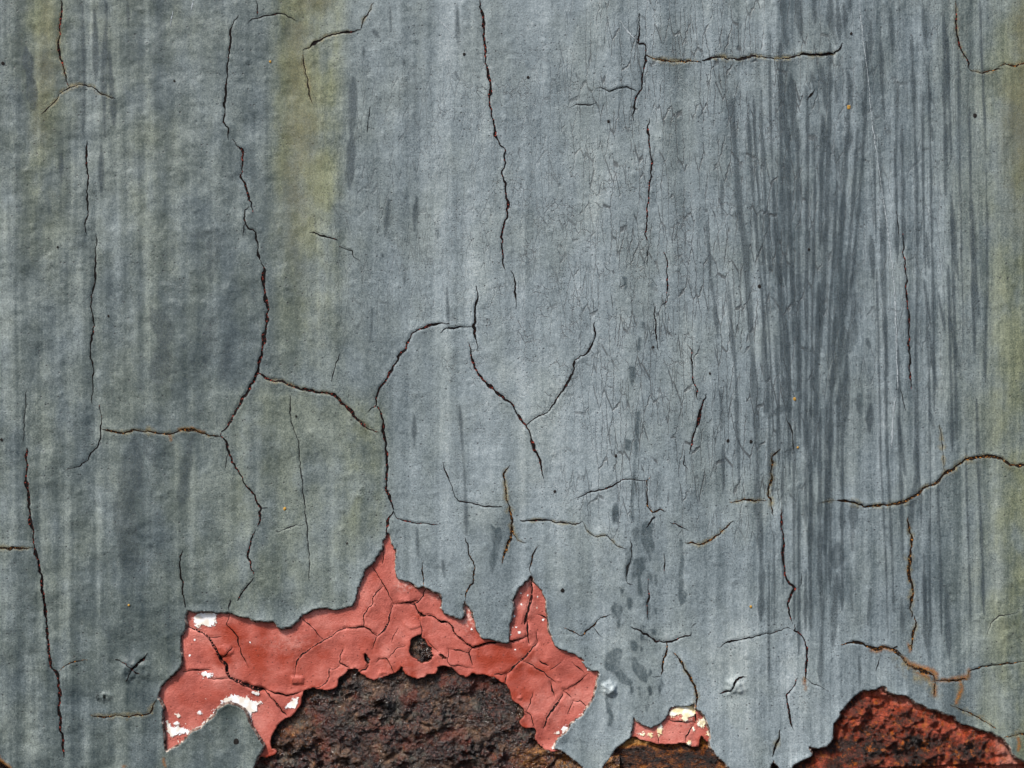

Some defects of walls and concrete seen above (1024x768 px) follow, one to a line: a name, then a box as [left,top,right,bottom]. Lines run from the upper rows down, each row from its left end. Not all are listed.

crack [67,1,596,610]
crack [569,13,842,349]
leakage [734,25,971,656]
leakage [907,196,988,391]
crack [0,390,85,758]
peeling [159,534,598,765]
corrosion [255,635,582,768]
crack [443,418,824,756]
corrosion [603,736,728,768]
peeling [631,705,709,747]
corrosion [794,687,1024,768]
crack [821,424,1024,739]